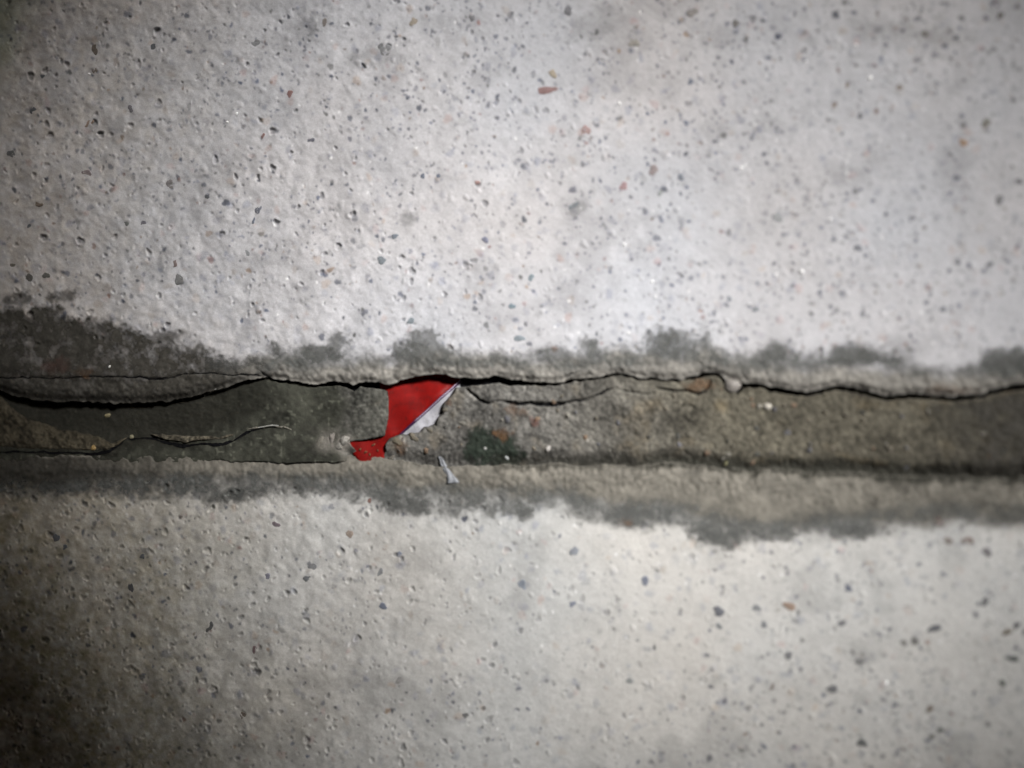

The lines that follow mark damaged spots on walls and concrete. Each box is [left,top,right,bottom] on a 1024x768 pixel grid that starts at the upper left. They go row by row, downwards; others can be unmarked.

leakage [0,292,358,404]
leakage [394,326,940,375]
leakage [956,346,1024,380]
crack [0,372,380,391]
crack [461,372,1024,407]
crack [0,429,257,455]
spalling [317,433,350,450]
leakage [650,394,1024,486]
leakage [0,472,1024,550]